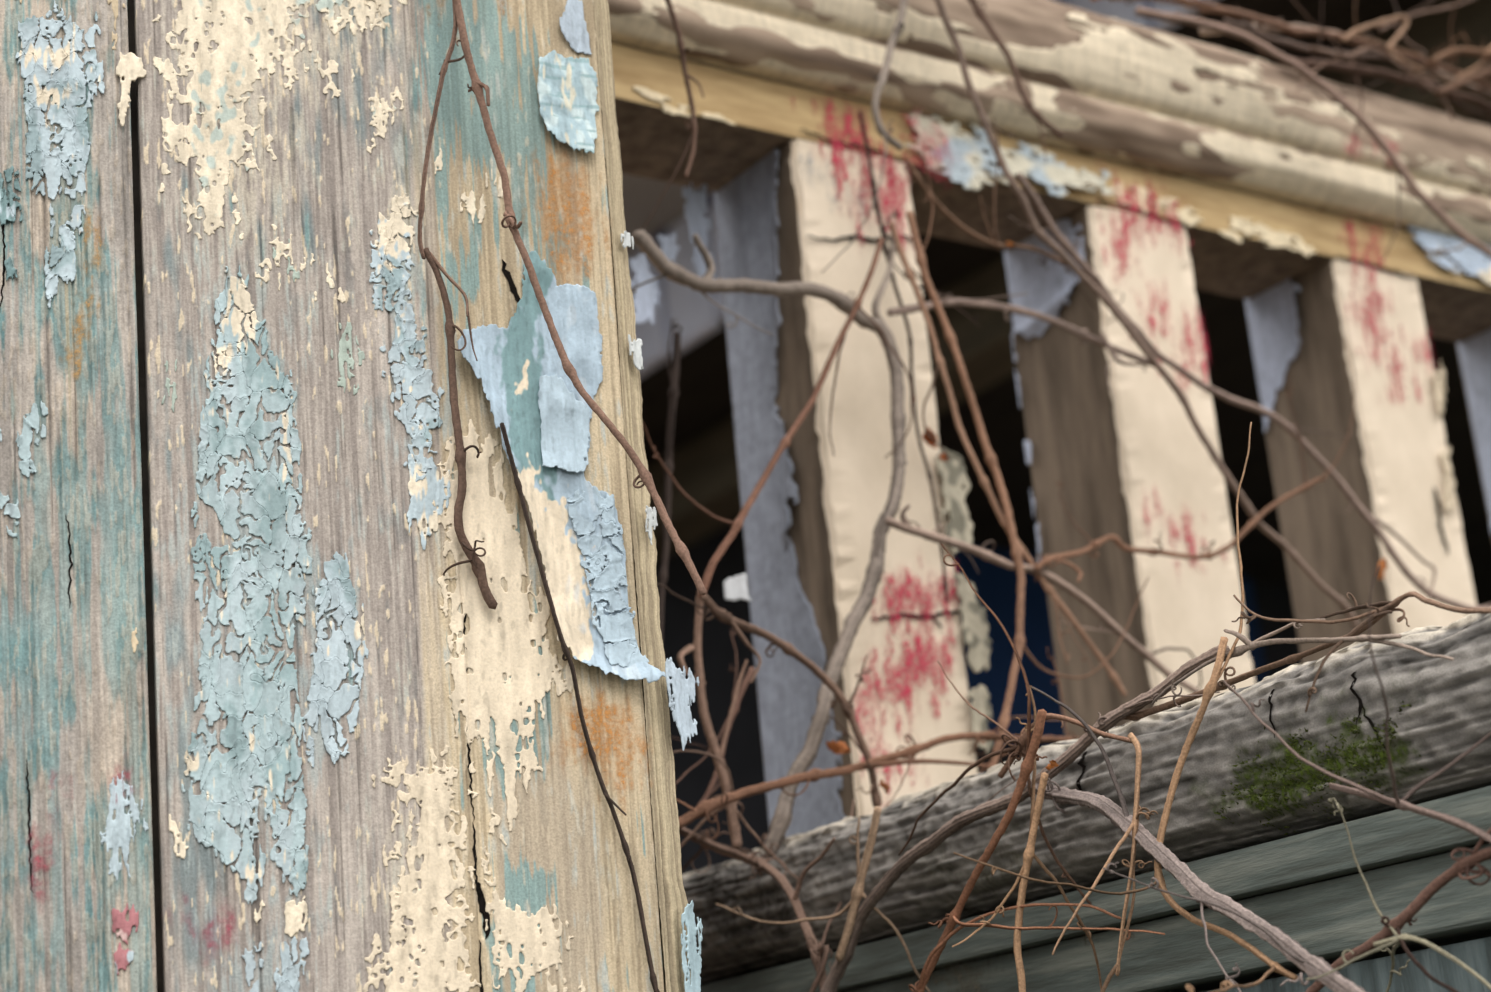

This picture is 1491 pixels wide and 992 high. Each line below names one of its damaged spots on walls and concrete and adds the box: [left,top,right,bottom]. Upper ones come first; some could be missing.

peeling [0,0,408,309]
peeling [537,0,600,154]
peeling [609,0,1491,285]
peeling [1004,219,1085,408]
peeling [1244,278,1301,433]
peeling [1433,329,1491,529]
peeling [169,224,369,992]
peeling [330,193,703,992]
peeling [100,771,149,881]
crack [1076,751,1087,791]
crack [1267,689,1275,738]
crack [1349,672,1386,750]